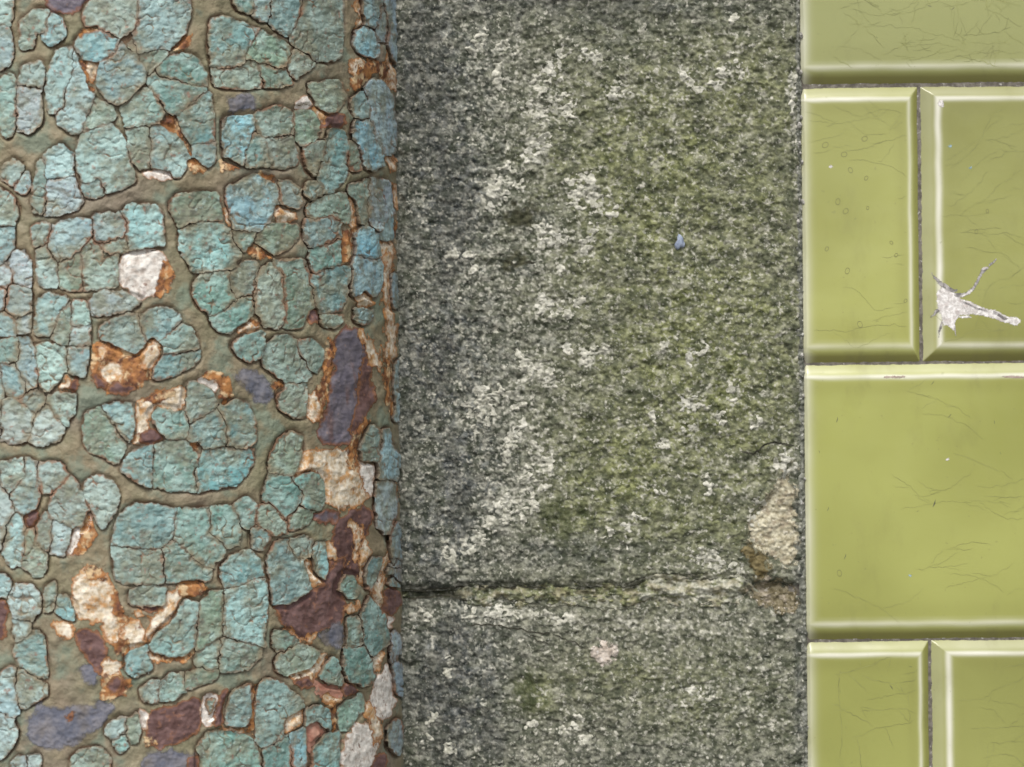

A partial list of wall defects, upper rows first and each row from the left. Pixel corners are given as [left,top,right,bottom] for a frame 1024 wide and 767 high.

peeling [931,259,1021,338]
corrosion [58,338,186,446]
peeling [0,0,404,767]
corrosion [197,370,234,405]
spalling [745,461,801,615]
corrosion [50,564,147,701]
crack [407,577,751,648]